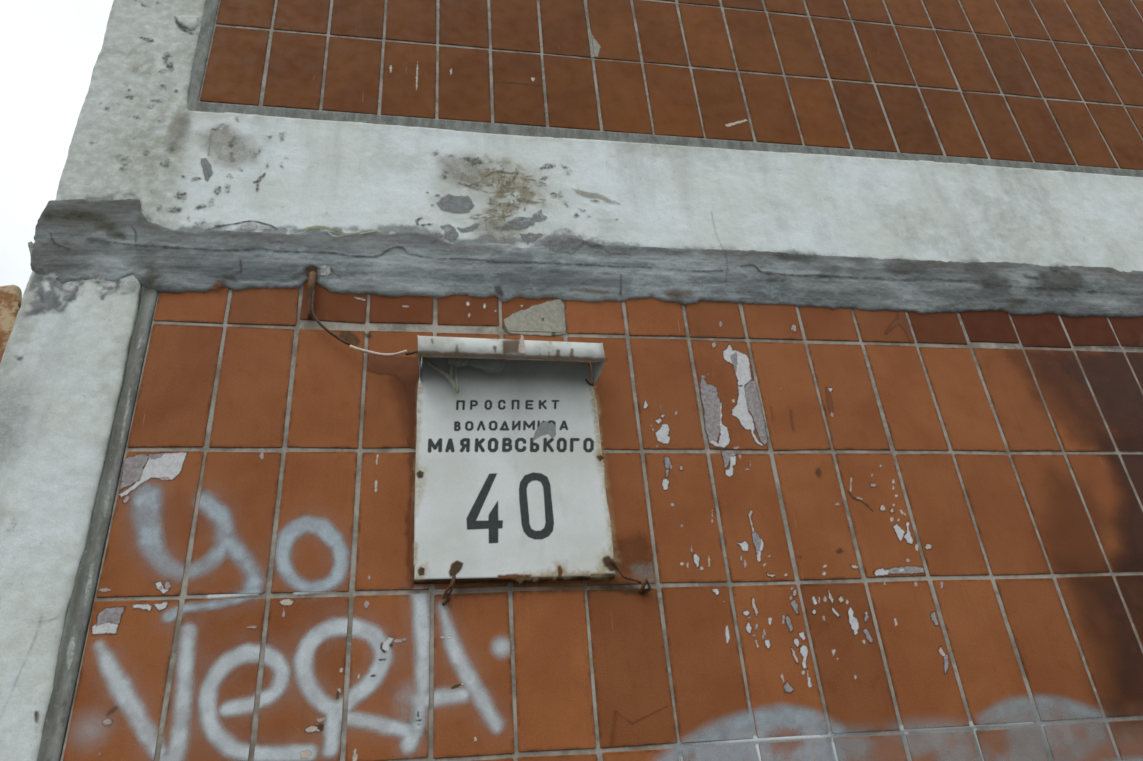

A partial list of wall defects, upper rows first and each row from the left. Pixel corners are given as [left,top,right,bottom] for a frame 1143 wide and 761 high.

spalling [182,158,230,194]
crack [48,212,651,294]
crack [684,264,858,278]
spalling [466,299,566,336]
peeling [700,342,767,477]
peeling [119,452,188,503]
peeling [680,545,710,570]
peeling [874,479,932,587]
peeling [738,510,812,688]
peeling [812,590,873,644]
peeling [938,646,949,674]